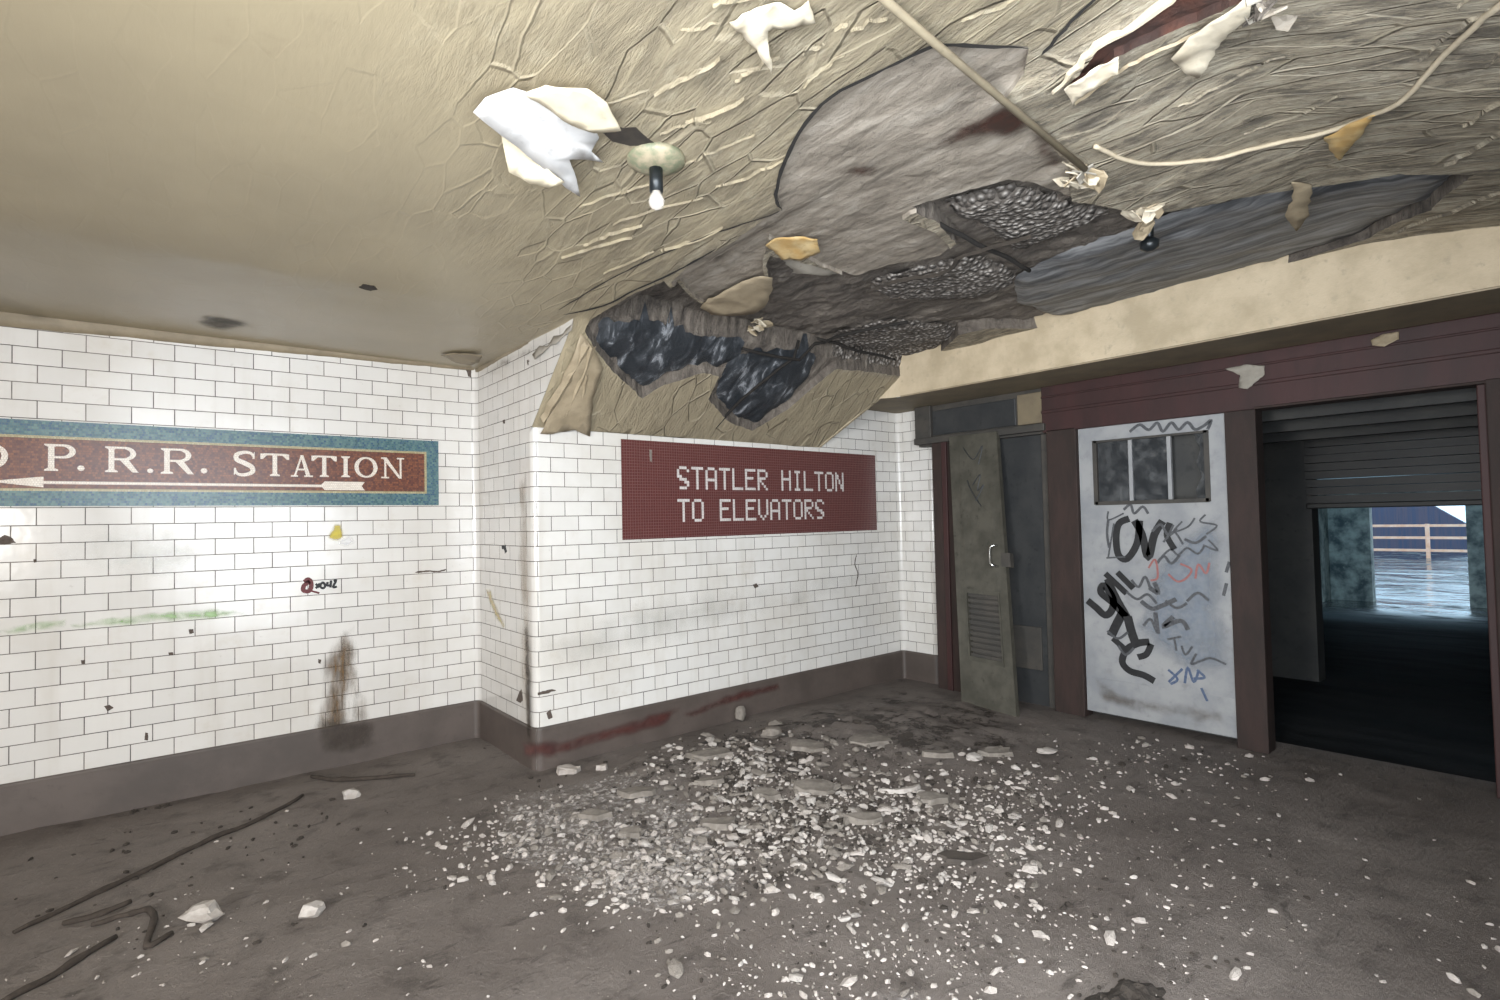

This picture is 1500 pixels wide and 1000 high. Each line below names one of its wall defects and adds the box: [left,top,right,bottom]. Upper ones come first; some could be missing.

peeling [473,0,816,208]
spalling [527,0,1500,436]